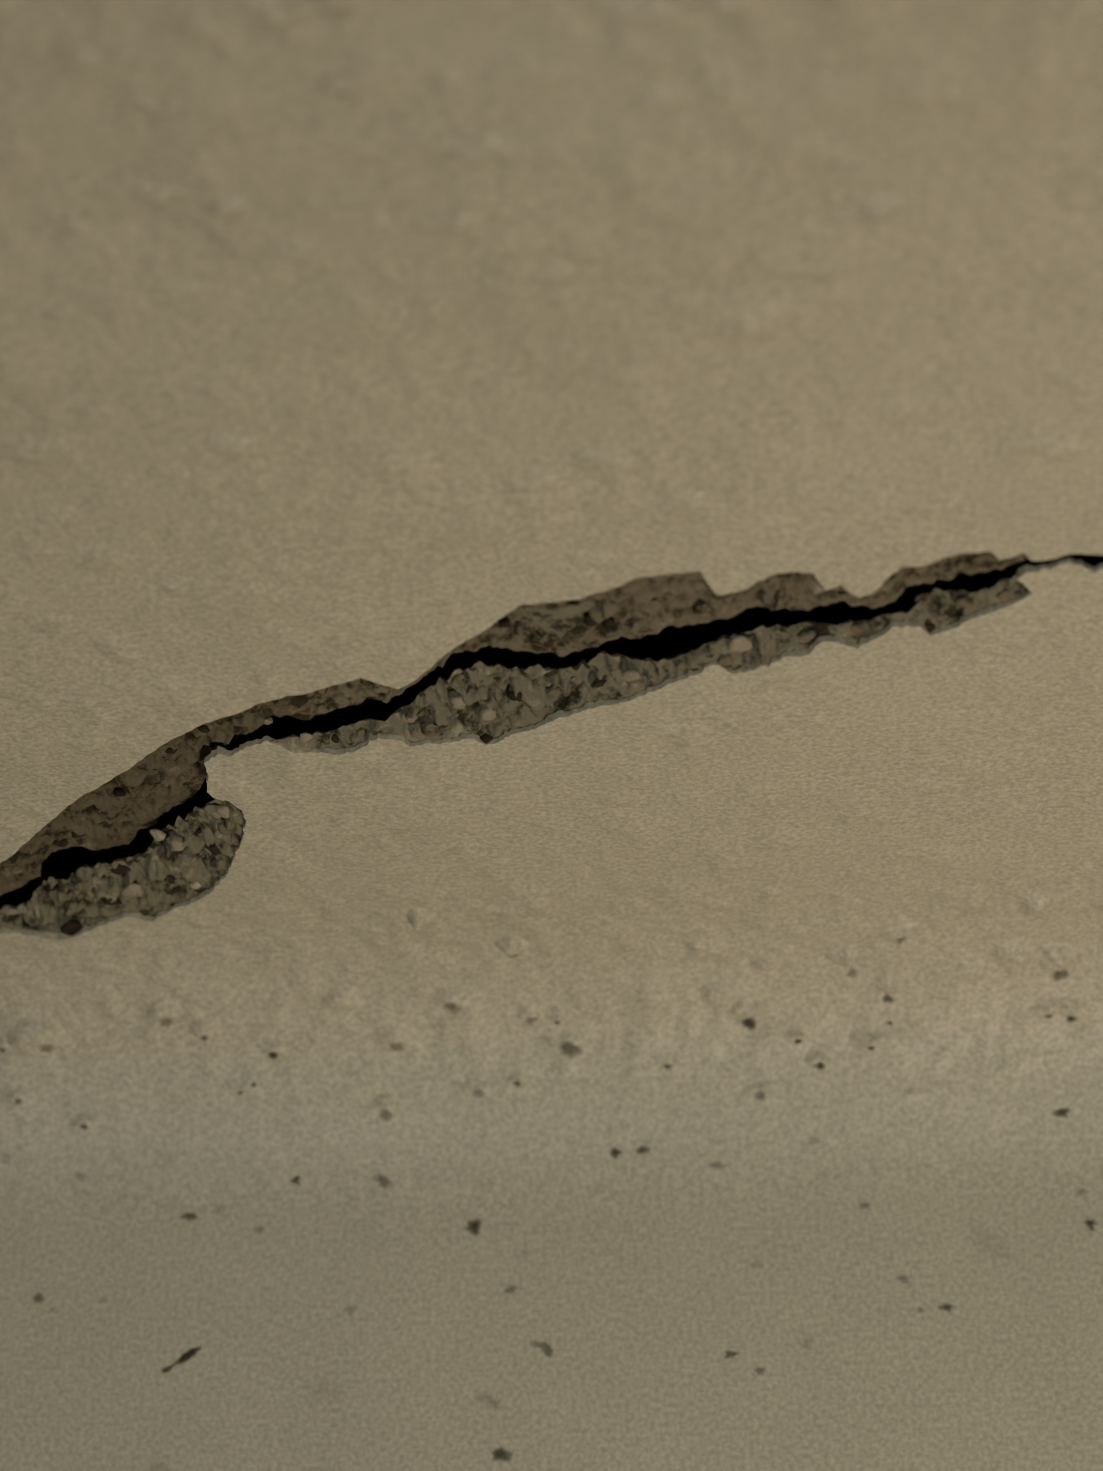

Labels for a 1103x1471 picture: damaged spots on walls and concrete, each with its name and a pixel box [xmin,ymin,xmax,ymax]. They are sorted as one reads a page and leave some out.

crack [0,553,1103,914]